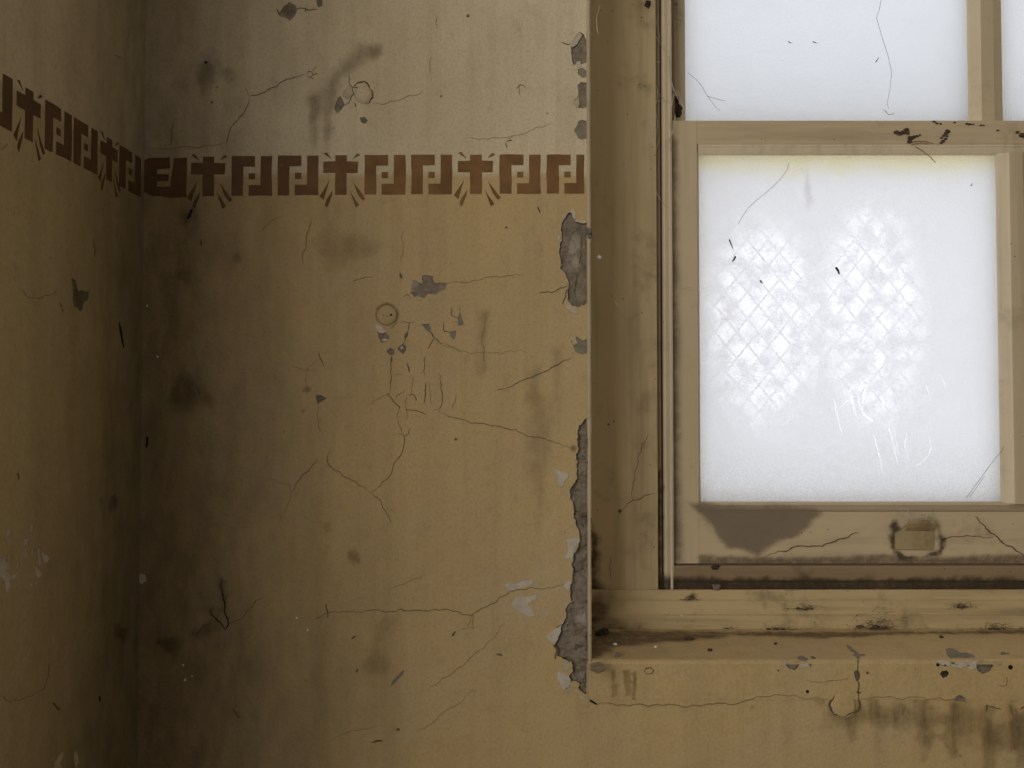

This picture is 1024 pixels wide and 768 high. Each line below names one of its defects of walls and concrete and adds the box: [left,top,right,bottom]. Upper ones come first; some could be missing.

crack [154,66,317,149]
flaking render [562,32,586,140]
peeling [411,275,447,298]
flaking render [540,209,587,314]
crack [263,359,572,524]
flaking render [546,418,606,701]
crack [315,577,564,730]
crack [590,644,865,707]
crack [864,679,1024,716]
flaking render [937,648,1009,678]